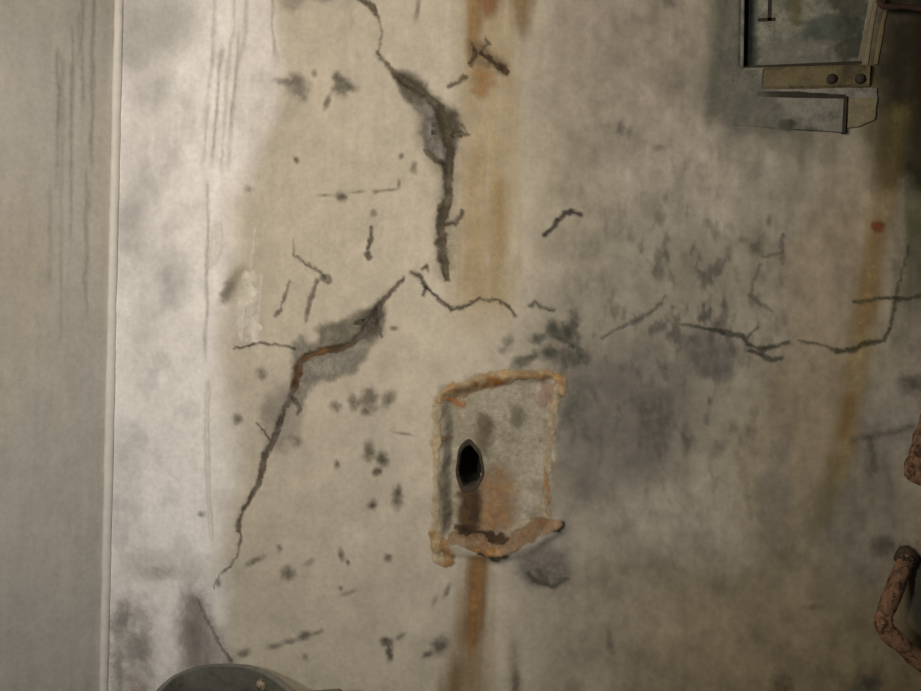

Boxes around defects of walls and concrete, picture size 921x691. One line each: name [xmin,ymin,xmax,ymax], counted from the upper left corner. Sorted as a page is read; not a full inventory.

crack [359,0,379,18]
spalling [397,73,459,167]
damp [879,0,921,303]
crack [543,209,582,236]
spalling [293,305,384,403]
crack [224,51,554,570]
damp [533,320,574,356]
crack [682,264,921,362]